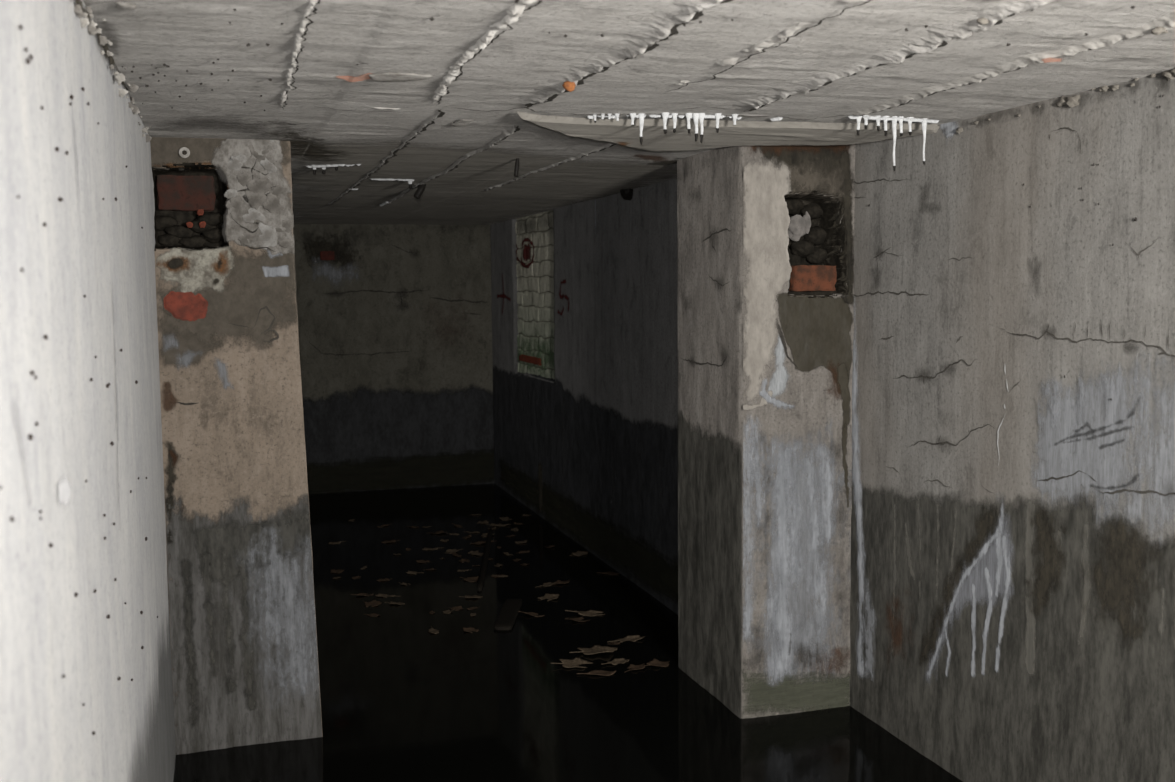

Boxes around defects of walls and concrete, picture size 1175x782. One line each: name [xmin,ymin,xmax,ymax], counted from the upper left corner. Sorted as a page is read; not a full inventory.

spalling [76,0,114,65]
crack [449,107,604,123]
spalling [152,163,229,251]
spalling [784,190,849,298]
spalling [162,291,208,321]
crack [1004,322,1175,357]
water stain [133,145,1175,782]
crack [1039,470,1175,496]